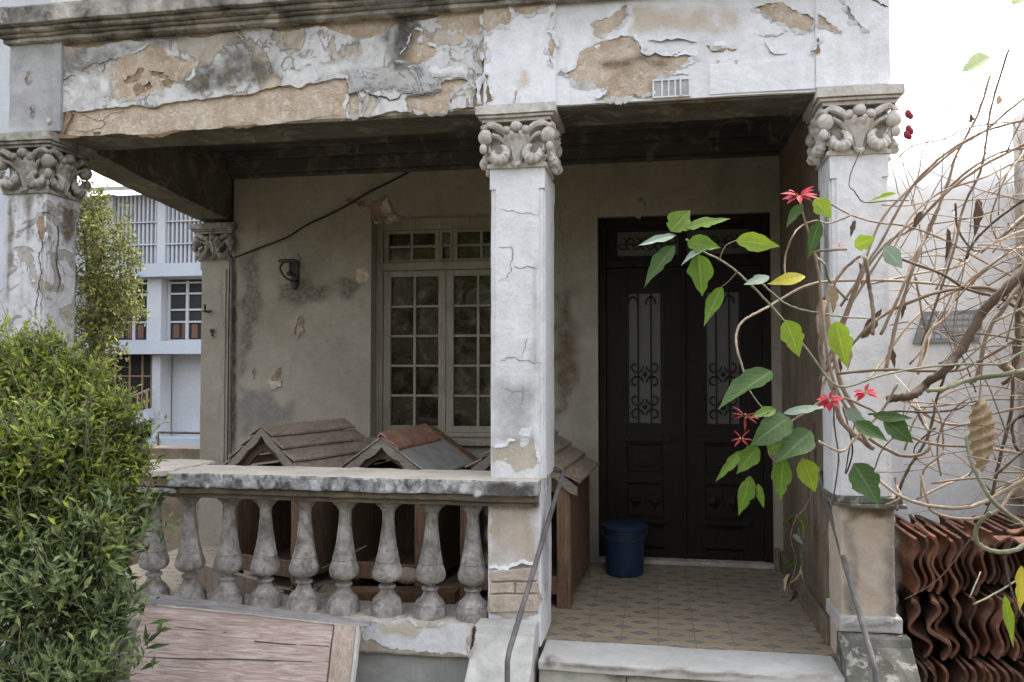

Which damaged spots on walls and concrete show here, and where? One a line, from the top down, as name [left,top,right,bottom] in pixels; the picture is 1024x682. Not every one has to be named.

peeling [394,27,437,68]
peeling [435,2,702,106]
peeling [750,0,869,54]
flaking render [29,43,363,140]
flaking render [406,79,469,117]
crack [35,225,61,313]
peeling [491,437,541,472]
flaking render [487,559,543,619]
peeling [362,617,473,659]